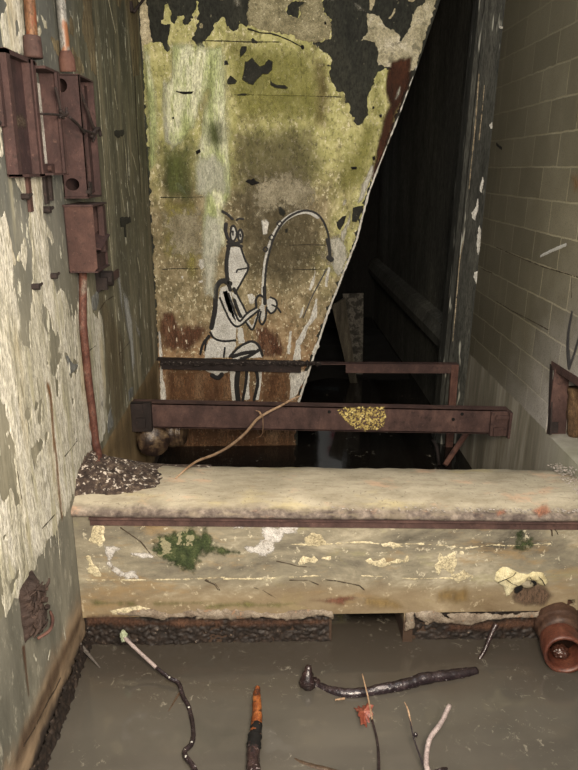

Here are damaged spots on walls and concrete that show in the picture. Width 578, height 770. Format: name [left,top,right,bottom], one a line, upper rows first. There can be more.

peeling [0,0,25,54]
rust [372,58,411,180]
spalling [138,0,436,402]
leakage [243,139,350,287]
peeling [0,212,114,618]
rust [161,313,205,351]
rust [181,428,293,446]
rust [160,327,321,401]
leakage [289,371,308,401]
leakage [287,298,317,360]
peeling [365,542,409,567]
leakage [17,616,145,762]